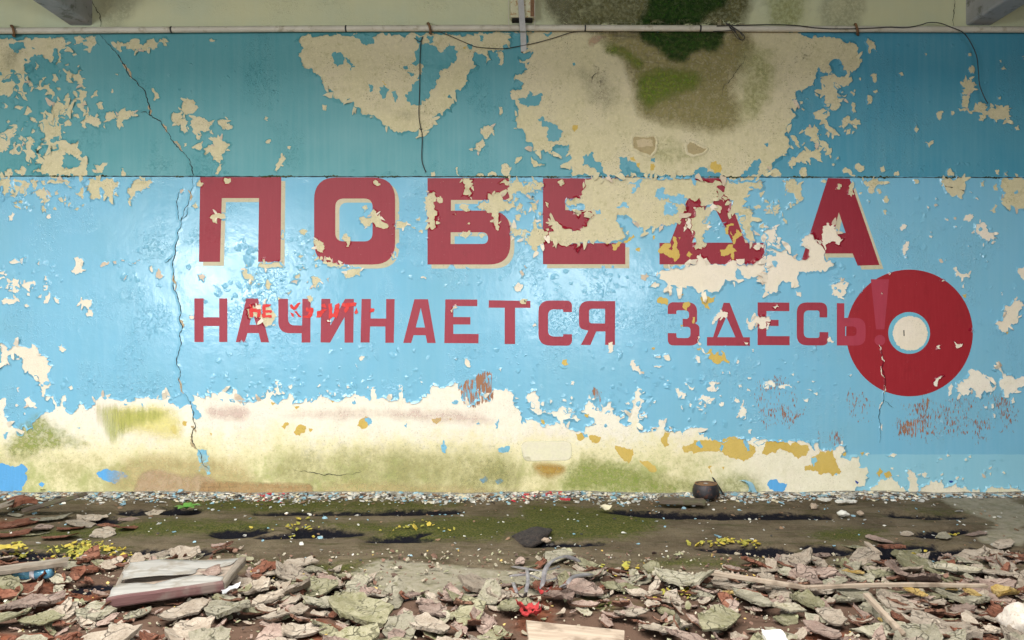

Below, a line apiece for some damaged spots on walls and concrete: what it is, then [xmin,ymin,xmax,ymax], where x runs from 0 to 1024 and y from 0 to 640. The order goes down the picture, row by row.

water stain [547,0,749,130]
peeling [0,254,61,309]
peeling [0,34,170,222]
peeling [170,98,235,185]
peeling [240,228,364,328]
crack [6,2,1024,475]
peeling [294,19,920,353]
peeling [925,167,1024,263]
peeling [993,291,1024,334]
rust [458,371,494,407]
peeling [0,335,1024,561]
rust [892,391,1019,445]